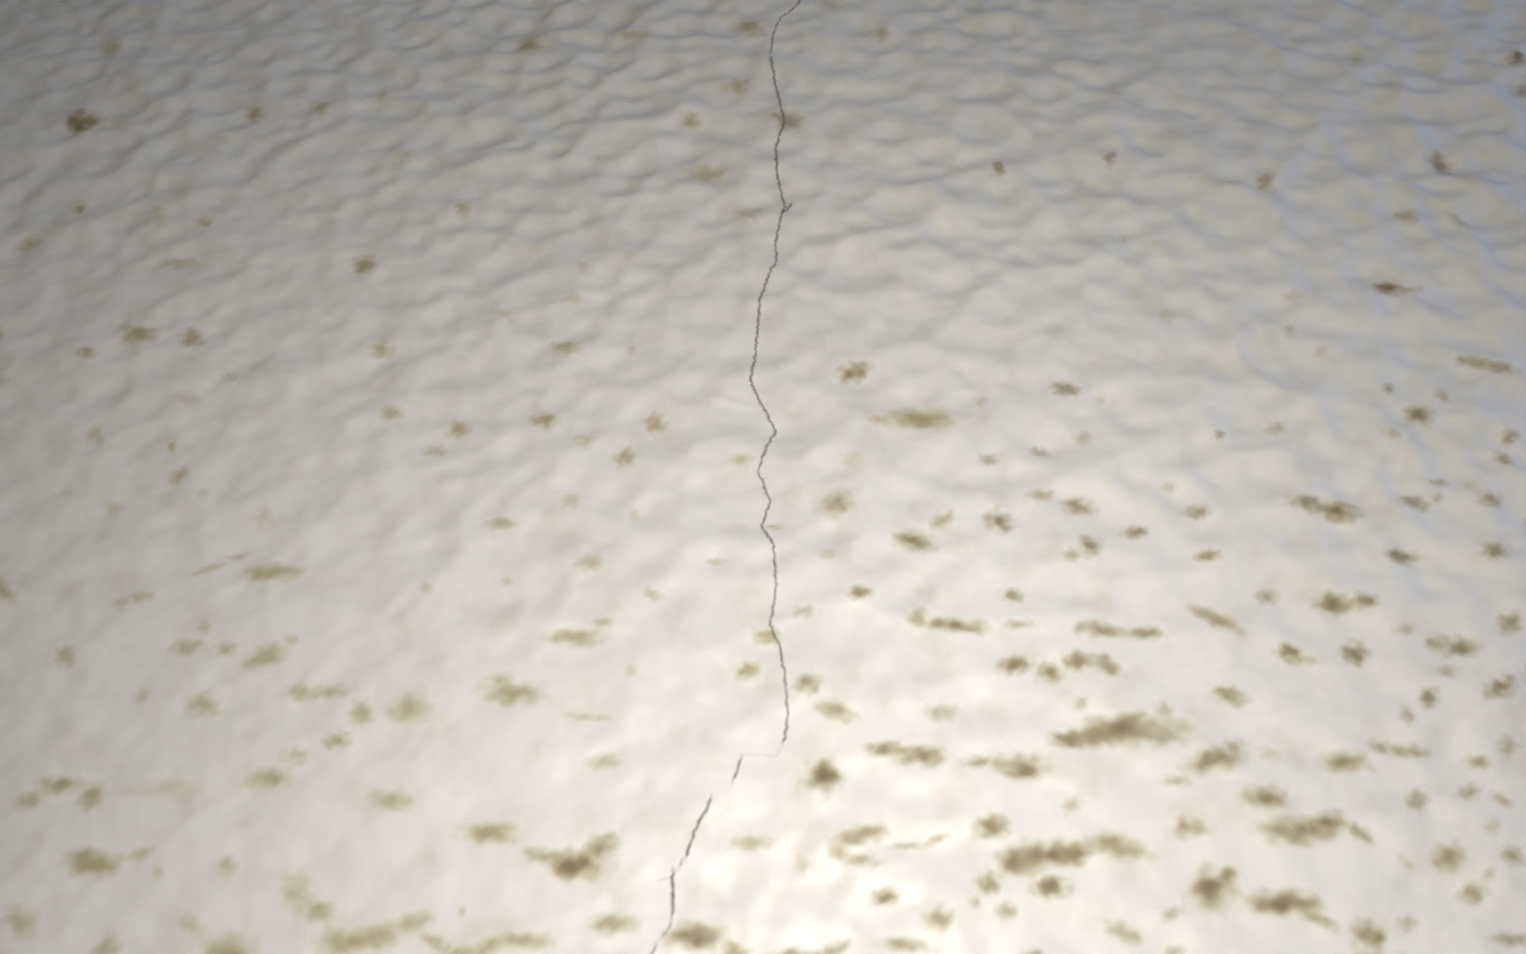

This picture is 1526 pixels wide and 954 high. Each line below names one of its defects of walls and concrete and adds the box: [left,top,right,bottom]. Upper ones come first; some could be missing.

crack [750,33,792,741]
crack [651,759,741,954]